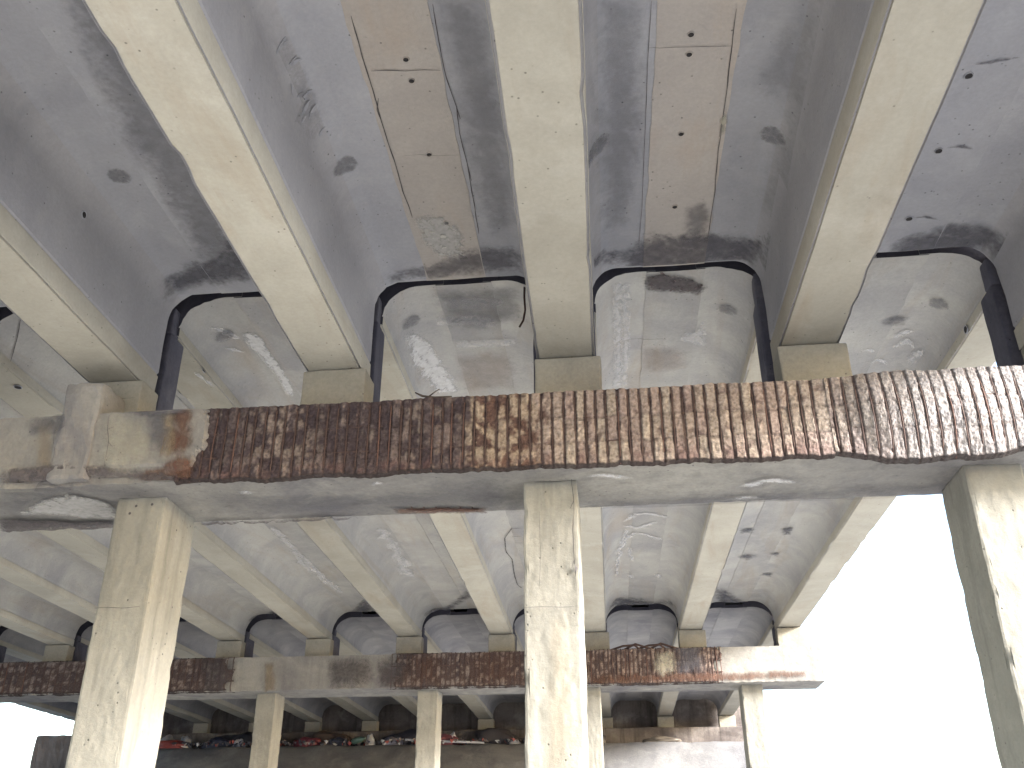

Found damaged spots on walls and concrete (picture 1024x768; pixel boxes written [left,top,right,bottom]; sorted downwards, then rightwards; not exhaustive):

damp [168,244,248,288]
damp [629,235,760,266]
damp [898,225,1002,252]
damp [214,328,293,395]
damp [407,335,457,392]
corrosion [142,410,192,481]
spalling [83,379,836,485]
crack [504,517,544,608]
spalling [0,660,86,697]
spalling [162,633,239,694]
spalling [332,651,525,690]
spalling [585,646,723,687]